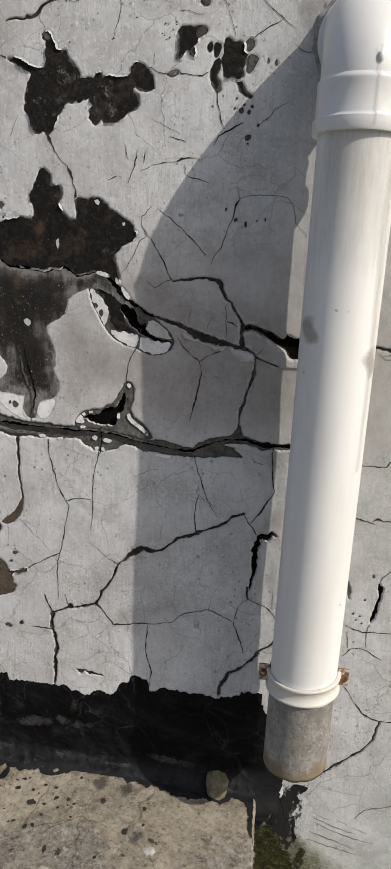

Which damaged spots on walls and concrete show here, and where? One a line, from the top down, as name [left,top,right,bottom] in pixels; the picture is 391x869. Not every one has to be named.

crack [6,0,78,27]
spalling [7,30,155,135]
crack [148,55,288,147]
spalling [162,21,278,114]
crack [46,132,78,208]
spalling [0,168,290,460]
crack [121,192,304,426]
crack [0,437,23,498]
crack [28,439,276,695]
crack [343,572,391,659]
crack [323,686,391,773]
leakage [239,692,321,869]